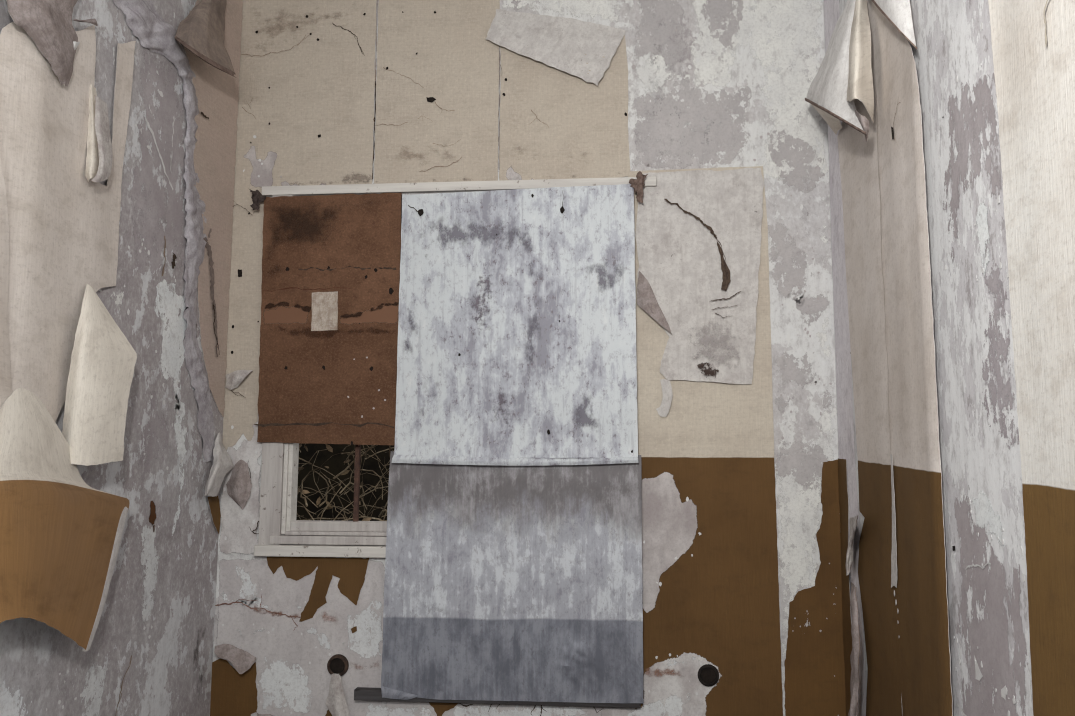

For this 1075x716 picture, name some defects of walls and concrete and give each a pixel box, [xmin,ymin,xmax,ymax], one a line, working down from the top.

peeling [631,0,866,716]
peeling [939,63,1019,449]
flaking render [216,422,722,716]
peeling [953,485,1032,716]